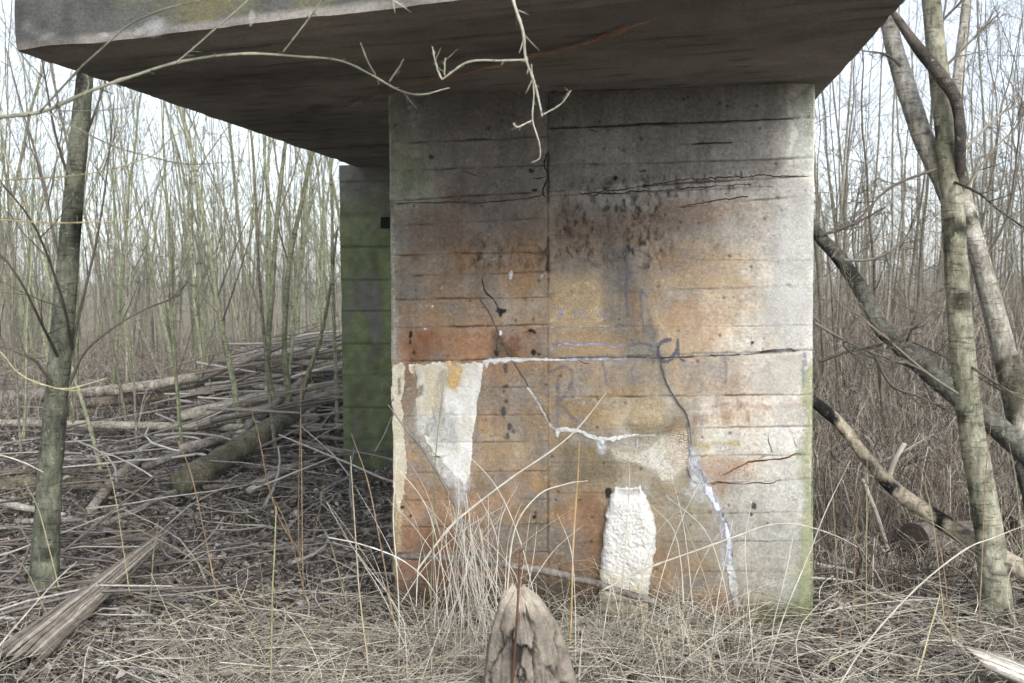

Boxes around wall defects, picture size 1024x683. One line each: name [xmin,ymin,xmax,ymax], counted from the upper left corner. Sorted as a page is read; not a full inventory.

crack [394,118,808,208]
crack [479,278,550,422]
damp [391,216,754,574]
damp [527,387,742,608]
crack [553,348,802,564]